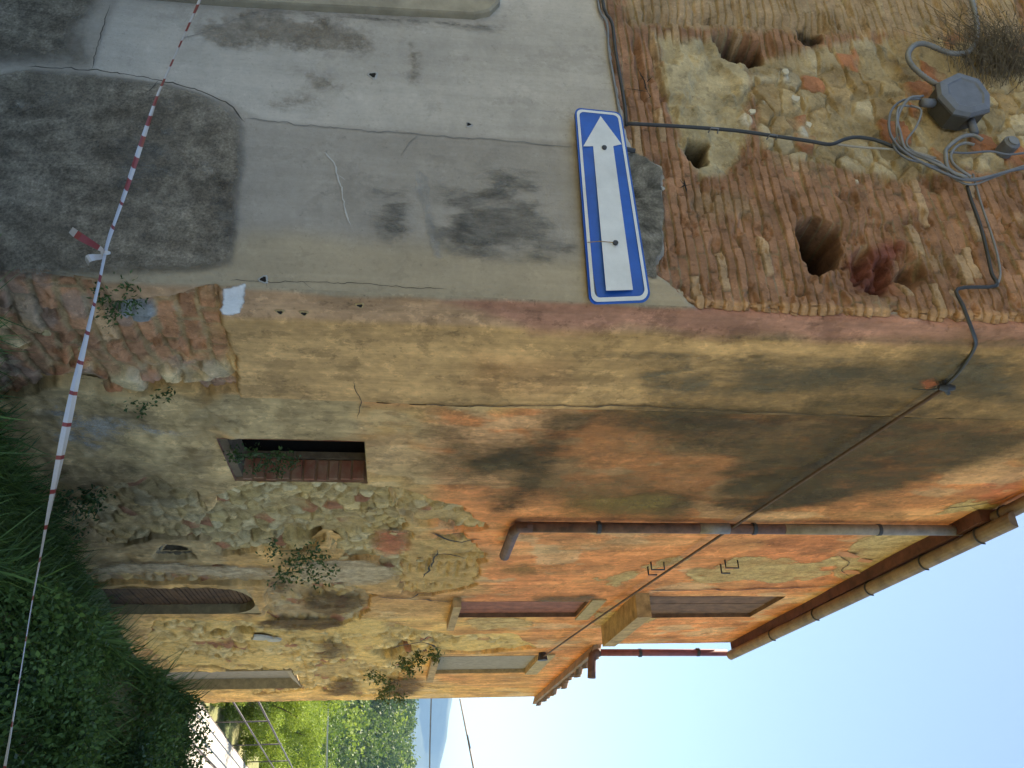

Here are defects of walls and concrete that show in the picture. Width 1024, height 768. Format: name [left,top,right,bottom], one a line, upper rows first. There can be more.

crack [32,6,570,155]
leakage [0,70,242,276]
crack [326,153,350,223]
leakage [439,175,546,256]
spalling [599,0,1024,324]
spalling [0,273,237,394]
crack [354,385,957,419]
leakage [440,352,1024,518]
spalling [85,476,485,593]
crack [382,533,481,601]
spalling [86,564,536,695]